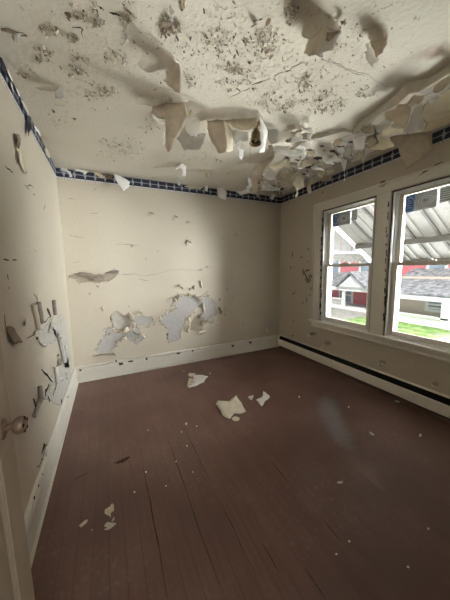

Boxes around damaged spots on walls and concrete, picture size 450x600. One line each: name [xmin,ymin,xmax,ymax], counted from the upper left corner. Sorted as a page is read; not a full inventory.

peeling [13,0,450,200]
peeling [4,296,82,418]
peeling [68,268,137,288]
peeling [93,281,231,365]